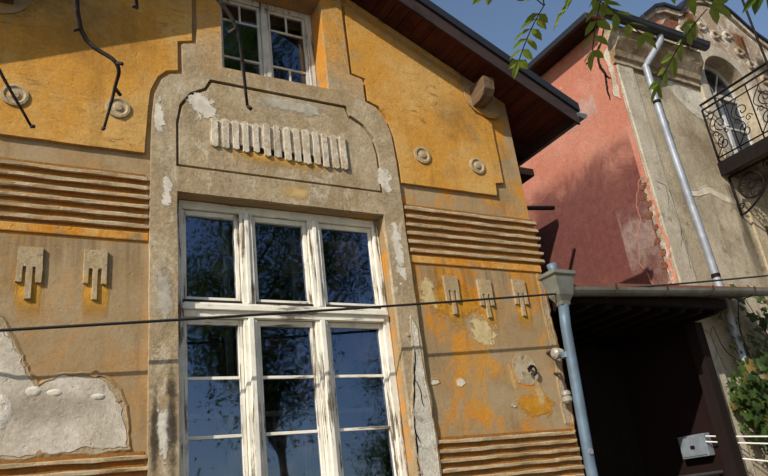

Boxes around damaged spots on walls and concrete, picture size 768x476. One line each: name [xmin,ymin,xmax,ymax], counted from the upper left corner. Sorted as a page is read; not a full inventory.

peeling [188,92,219,120]
peeling [377,168,392,195]
spalling [636,174,677,284]
flaking render [0,313,133,463]
crack [412,352,424,476]
flaking render [512,353,540,386]